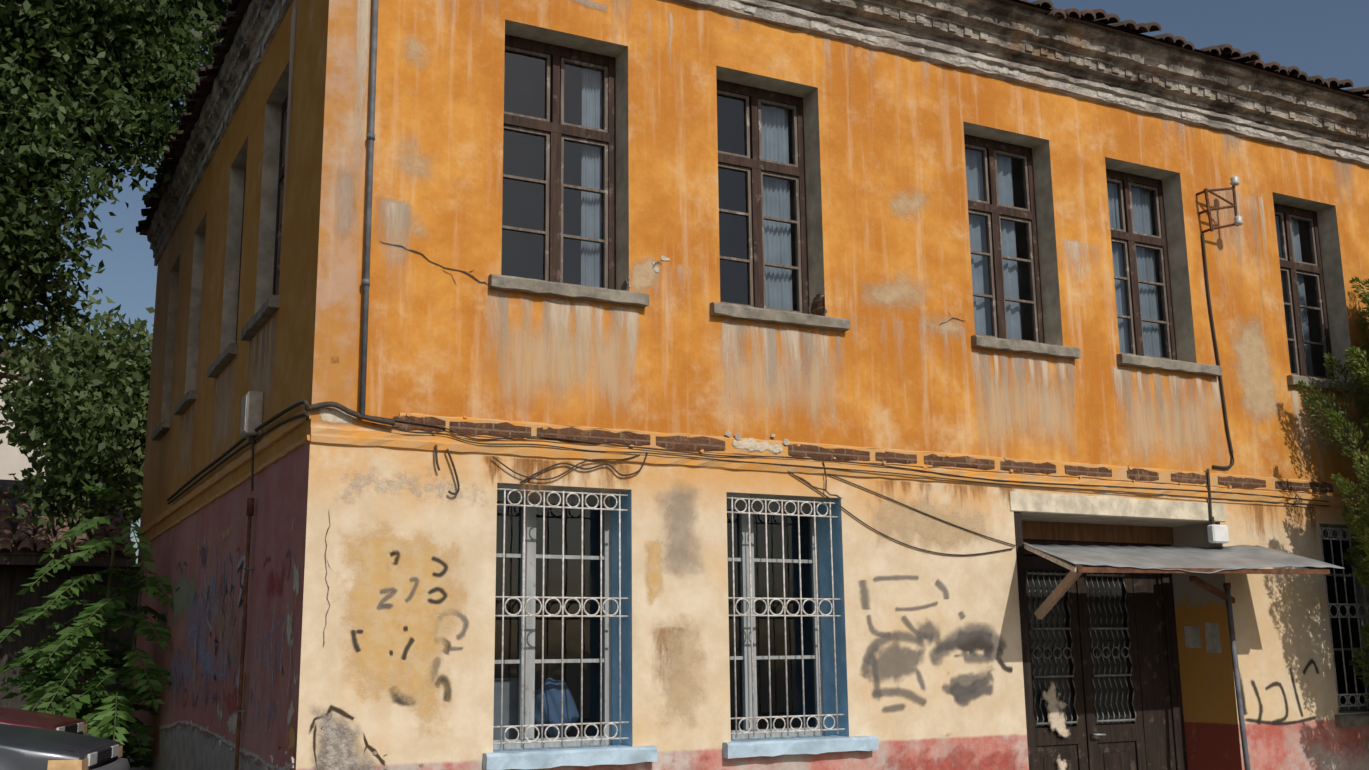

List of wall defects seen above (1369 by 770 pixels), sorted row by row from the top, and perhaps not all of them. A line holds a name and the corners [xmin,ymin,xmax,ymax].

crack [380,241,487,285]
water stain [490,294,638,397]
water stain [722,322,840,411]
water stain [974,352,1074,433]
peeling [888,750,1016,770]